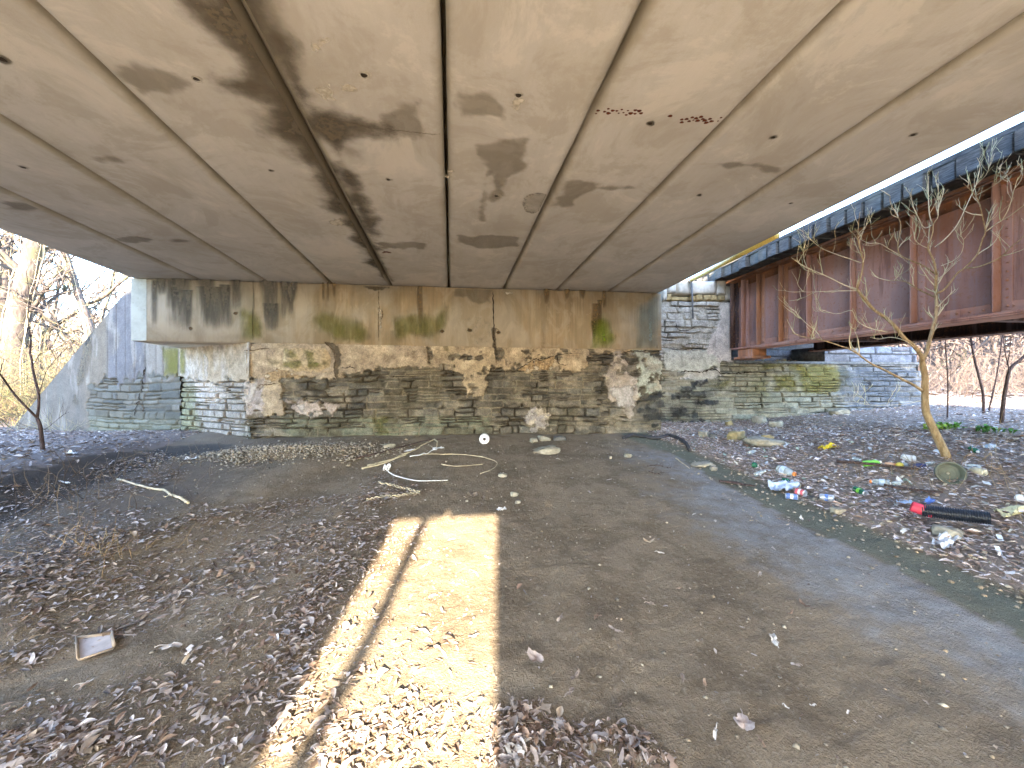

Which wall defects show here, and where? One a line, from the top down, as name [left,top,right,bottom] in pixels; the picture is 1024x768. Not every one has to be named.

leakage [182,0,393,268]
rust [668,115,722,124]
leakage [152,278,240,324]
leakage [260,279,297,327]
crack [488,295,572,372]
spalling [325,342,341,379]